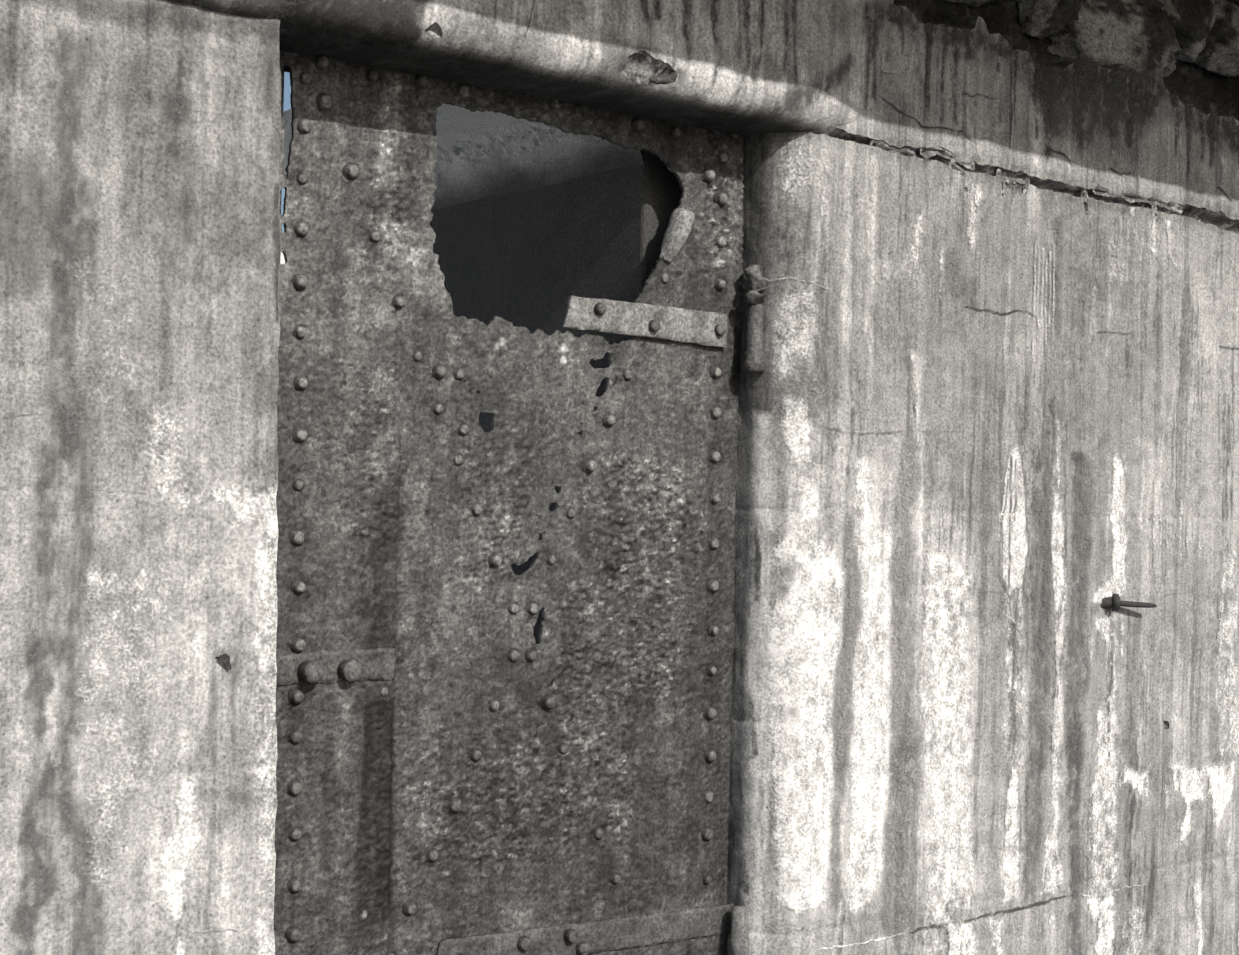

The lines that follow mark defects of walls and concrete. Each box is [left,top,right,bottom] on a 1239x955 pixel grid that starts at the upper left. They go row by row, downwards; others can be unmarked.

water stain [166,0,427,107]
spalling [621,50,677,86]
spalling [893,0,1078,70]
water stain [755,0,1239,216]
crack [837,56,1239,234]
spalling [1146,59,1239,122]
water stain [1,33,175,955]
water stain [145,406,278,955]
water stain [762,290,1003,955]
water stain [1065,454,1149,955]
water stain [1165,542,1239,841]
crack [818,884,1146,950]